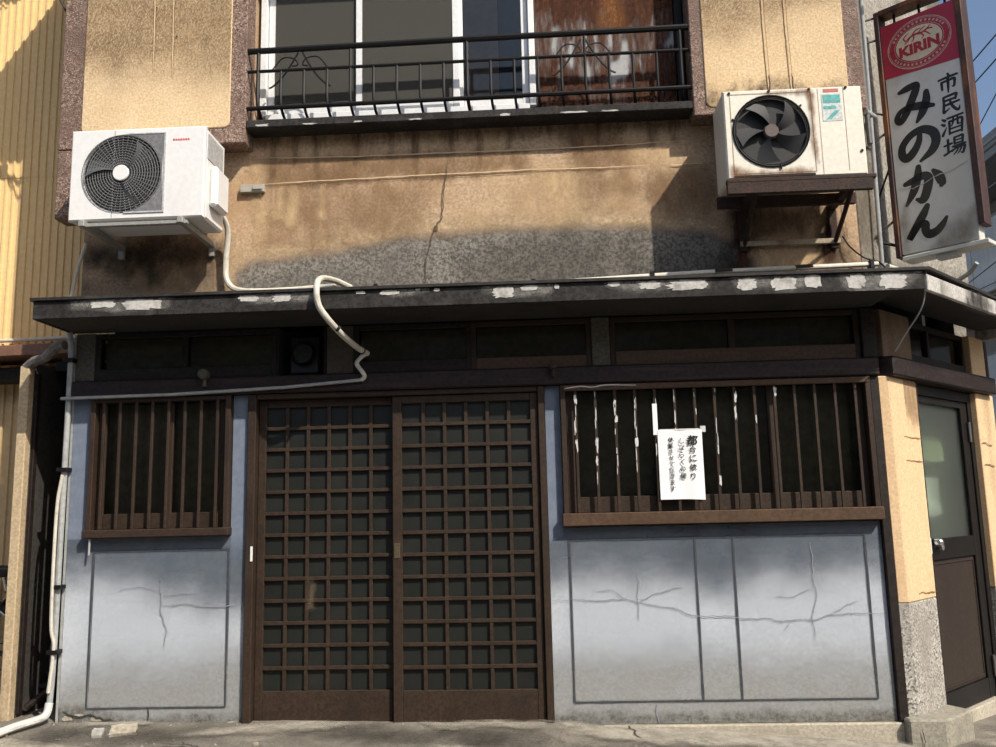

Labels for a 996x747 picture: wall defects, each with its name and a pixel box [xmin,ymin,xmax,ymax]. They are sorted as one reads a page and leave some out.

water stain [85,0,232,70]
crack [153,0,175,77]
rust [534,0,678,108]
crack [263,140,701,283]
peeling [73,297,169,311]
flaking render [236,214,822,303]
peeling [842,271,920,291]
crack [120,580,236,644]
crack [552,547,887,642]